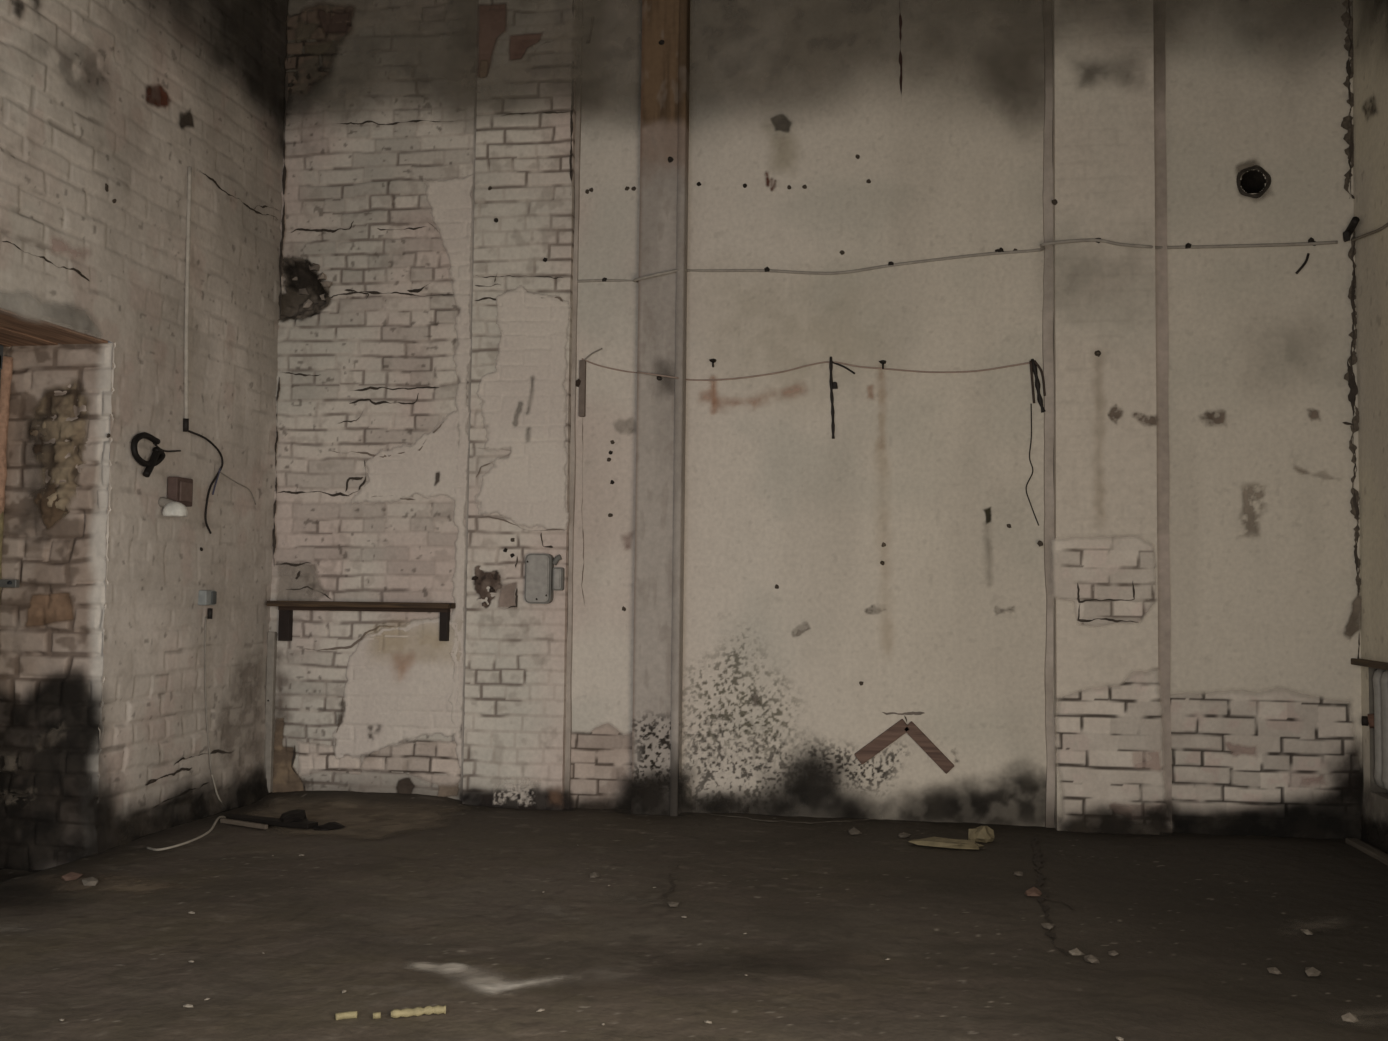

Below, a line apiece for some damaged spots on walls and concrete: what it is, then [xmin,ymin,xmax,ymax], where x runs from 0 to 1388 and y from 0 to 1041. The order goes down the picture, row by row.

peeling [285,4,354,94]
peeling [478,4,542,78]
spalling [278,257,332,321]
spalling [29,381,88,529]
spalling [277,564,324,601]
spalling [472,566,518,609]
spalling [1052,537,1156,626]
spalling [146,662,461,797]
mould [697,654,786,791]
mould [809,749,898,784]
spalling [1056,670,1359,825]